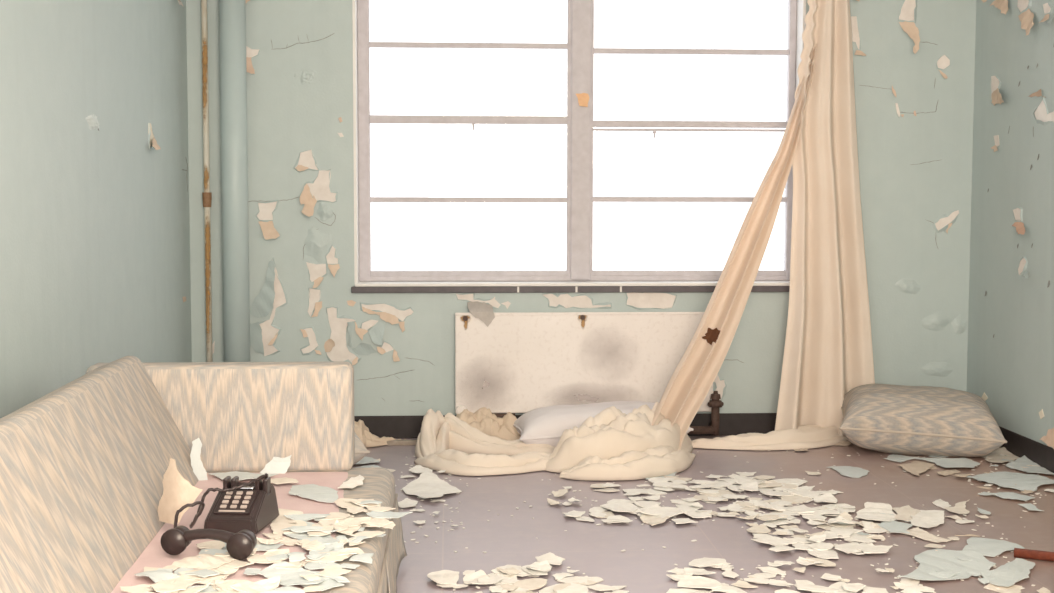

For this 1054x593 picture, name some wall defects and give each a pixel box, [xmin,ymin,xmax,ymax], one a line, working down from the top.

peeling [982,0,1054,35]
peeling [1028,89,1054,126]
peeling [293,150,338,217]
peeling [255,200,280,240]
peeling [1012,206,1033,279]
peeling [250,258,288,357]
peeling [300,245,414,365]
peeling [456,293,511,327]
peeling [542,293,612,309]
peeling [625,292,677,310]